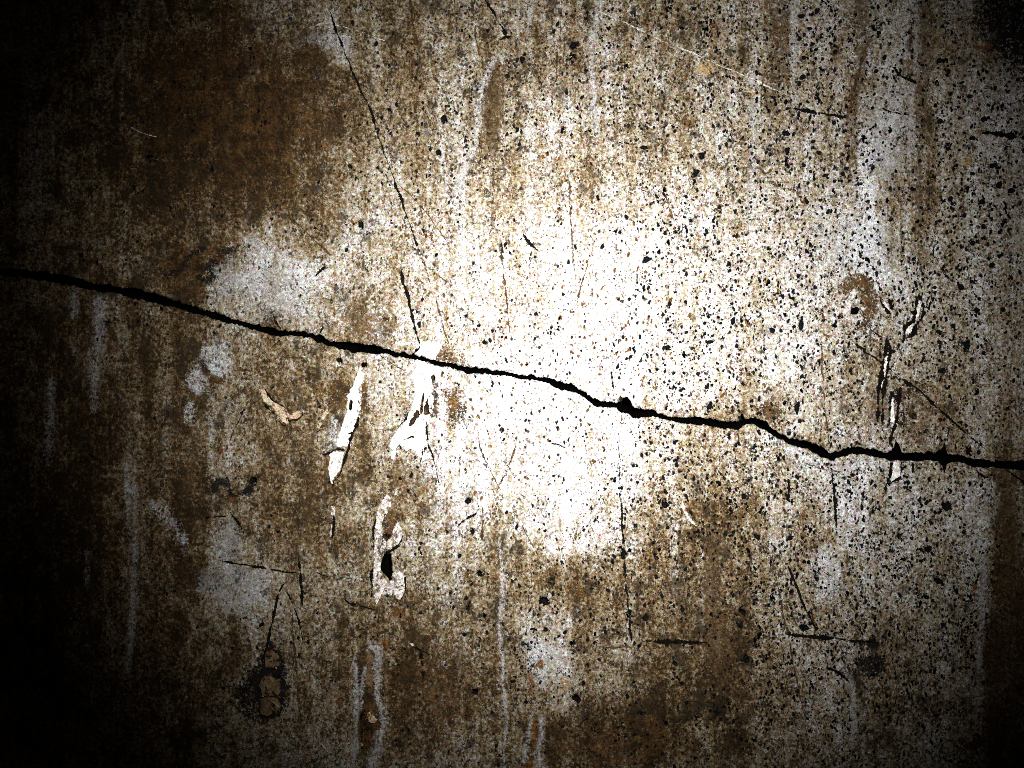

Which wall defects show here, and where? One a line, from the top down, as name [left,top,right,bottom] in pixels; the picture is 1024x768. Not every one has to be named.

leakage [295,28,357,56]
leakage [162,246,216,286]
crack [0,12,1024,528]
leakage [43,376,58,467]
leakage [87,295,108,411]
peeling [315,362,369,487]
spalling [389,341,442,460]
peeling [369,488,406,618]
spalling [232,639,290,722]